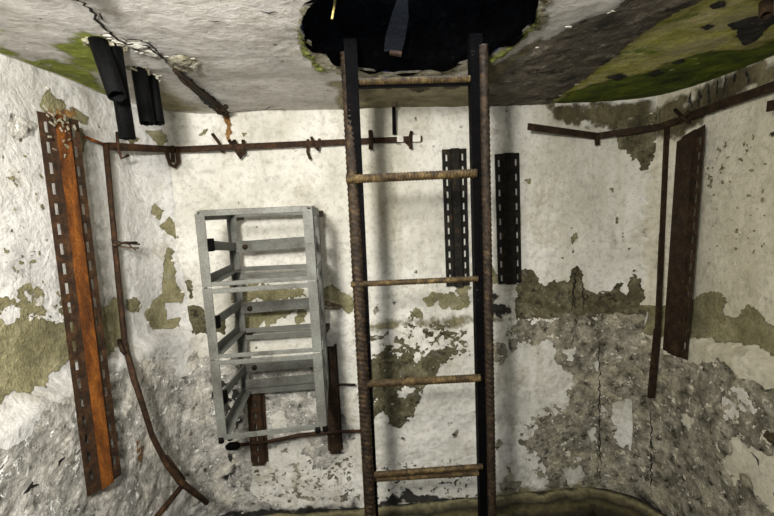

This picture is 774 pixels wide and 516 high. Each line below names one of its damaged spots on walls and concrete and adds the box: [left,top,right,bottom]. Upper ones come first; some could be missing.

peeling [617,112,658,171]
water stain [546,60,774,139]
peeling [151,203,176,239]
peeling [0,248,77,404]
peeling [0,350,360,516]
peeling [96,247,309,356]
peeling [370,285,471,428]
crack [571,269,586,310]
crack [595,333,603,487]
peeling [493,266,774,516]
crack [648,400,656,491]